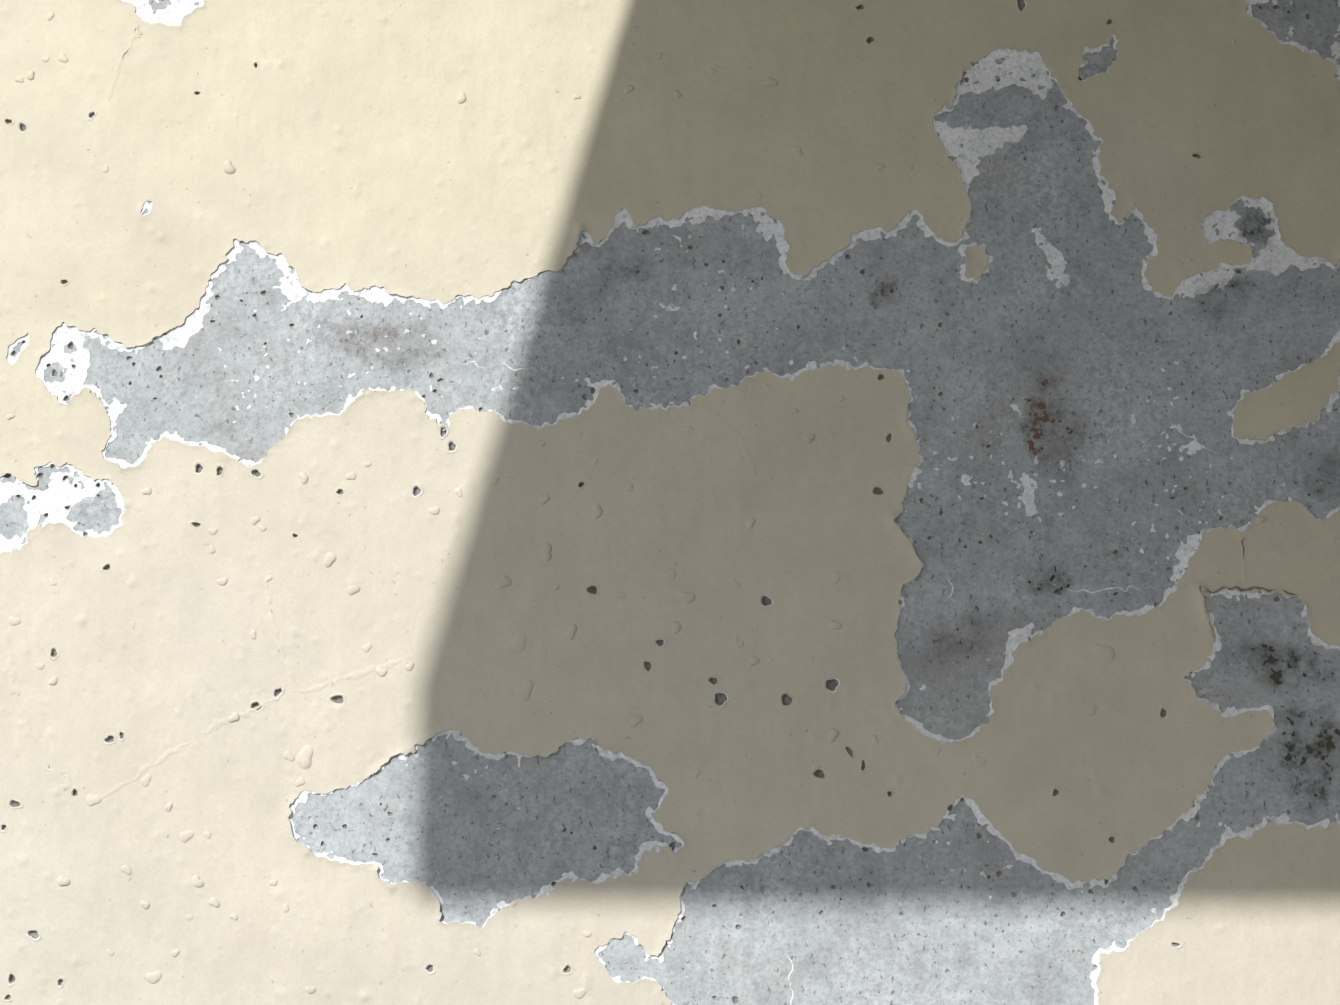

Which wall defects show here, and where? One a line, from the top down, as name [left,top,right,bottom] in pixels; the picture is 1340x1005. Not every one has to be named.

peeling [121,0,204,38]
peeling [1245,0,1340,81]
peeling [35,48,1340,745]
peeling [0,462,126,553]
peeling [289,730,684,928]
peeling [594,589,1340,1005]
peeling [25,928,42,942]